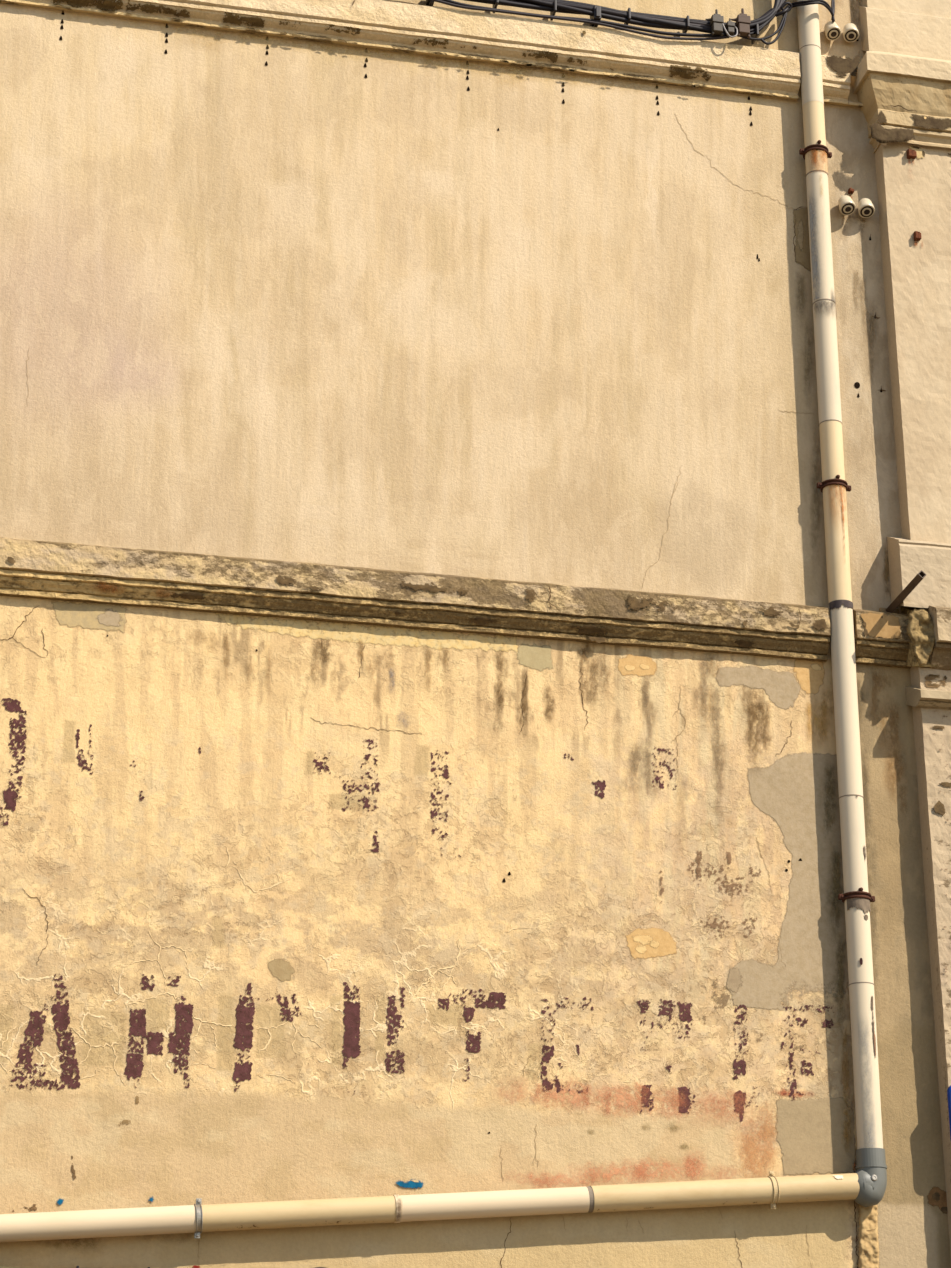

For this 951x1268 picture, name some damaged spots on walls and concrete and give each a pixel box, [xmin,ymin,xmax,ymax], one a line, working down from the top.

spalling [870,111,951,159]
crack [642,466,682,587]
crack [0,606,48,658]
crack [408,927,529,1004]
crack [126,931,323,1083]
crack [0,1025,33,1074]
crack [60,1027,126,1084]
crack [854,1201,875,1268]